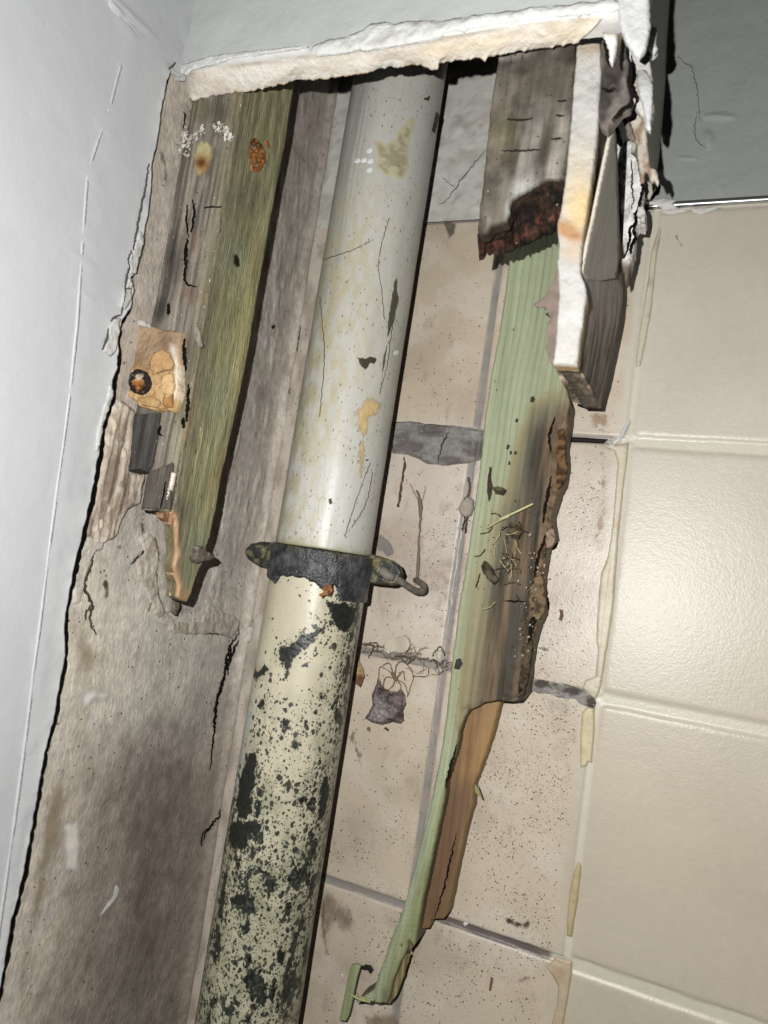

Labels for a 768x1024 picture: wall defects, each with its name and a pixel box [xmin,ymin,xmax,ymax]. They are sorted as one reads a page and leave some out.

spalling [183,15,602,101]
peeling [354,116,415,180]
peeling [615,0,661,289]
peeling [194,326,204,348]
crack [0,62,176,999]
peeling [72,399,177,605]
spalling [136,533,254,642]
crack [208,628,240,770]
peeling [384,636,411,654]
crack [201,809,221,846]